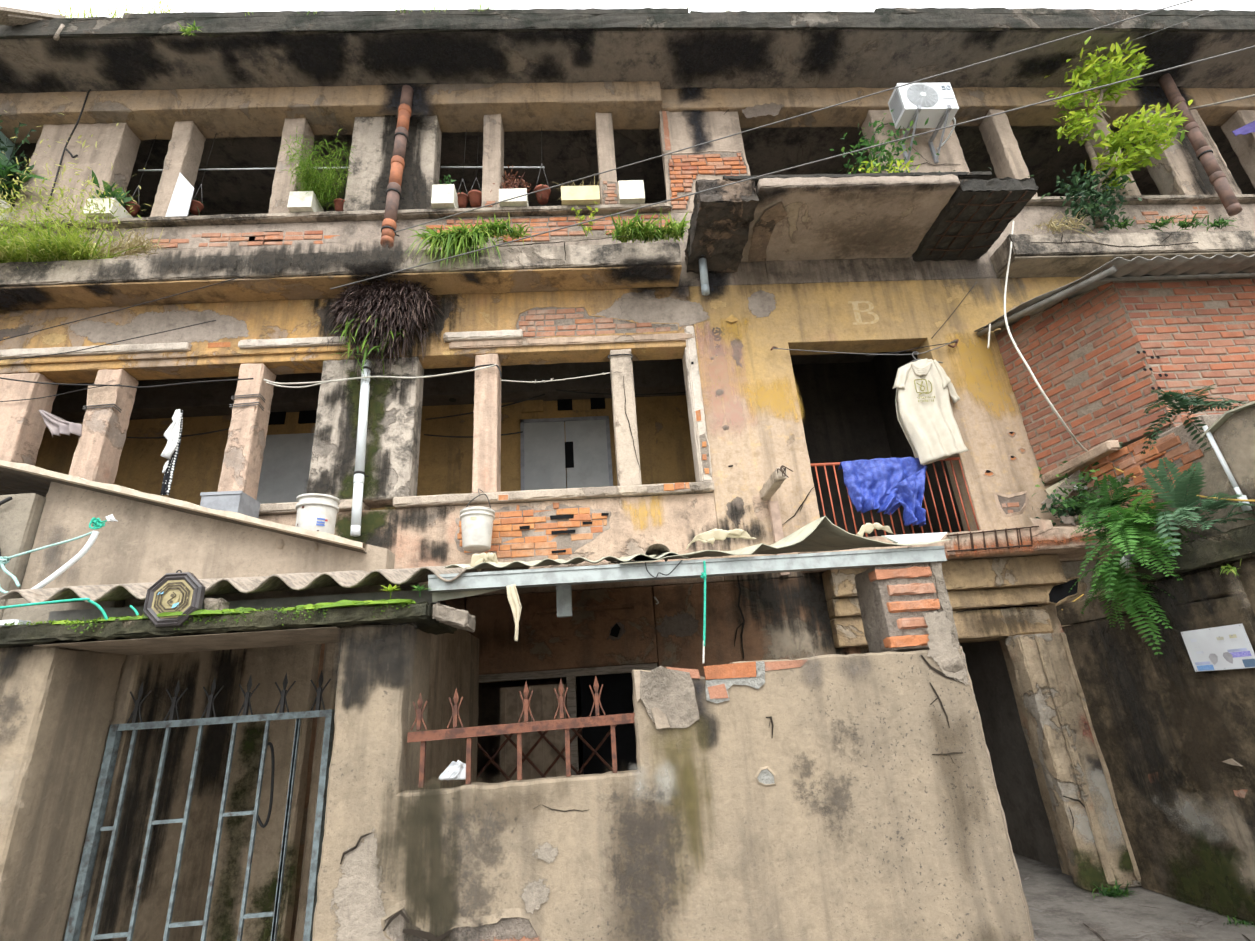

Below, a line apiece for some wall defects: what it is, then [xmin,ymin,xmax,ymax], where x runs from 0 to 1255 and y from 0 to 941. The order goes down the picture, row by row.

water stain [48,26,593,210]
water stain [0,285,54,313]
flaking render [513,290,776,339]
water stain [307,294,457,497]
flaking render [454,494,612,562]
water stain [86,649,269,941]
peeling [634,670,642,701]
peeling [651,707,670,729]
water stain [664,679,717,830]
crack [1063,796,1085,832]
water stain [1089,567,1214,794]
peeling [330,829,550,941]